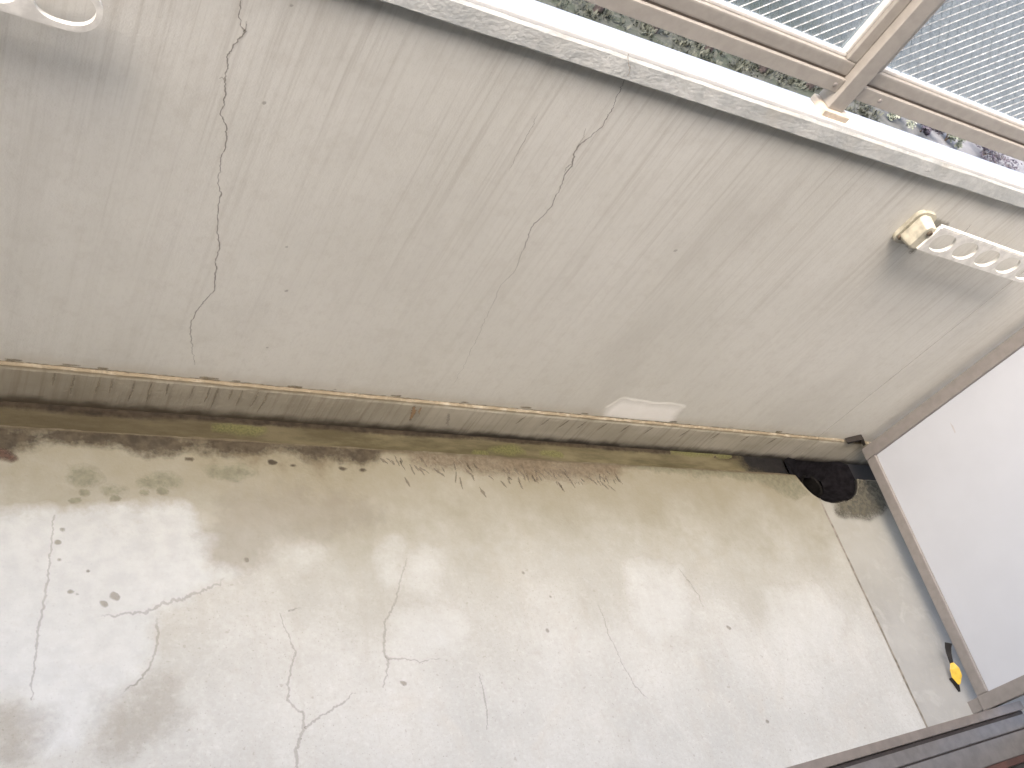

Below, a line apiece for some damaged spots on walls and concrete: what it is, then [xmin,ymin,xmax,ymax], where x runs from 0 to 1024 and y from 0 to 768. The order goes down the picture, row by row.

crack [190,1,247,362]
crack [457,54,631,378]
damp [0,426,813,763]
damp [835,480,887,519]